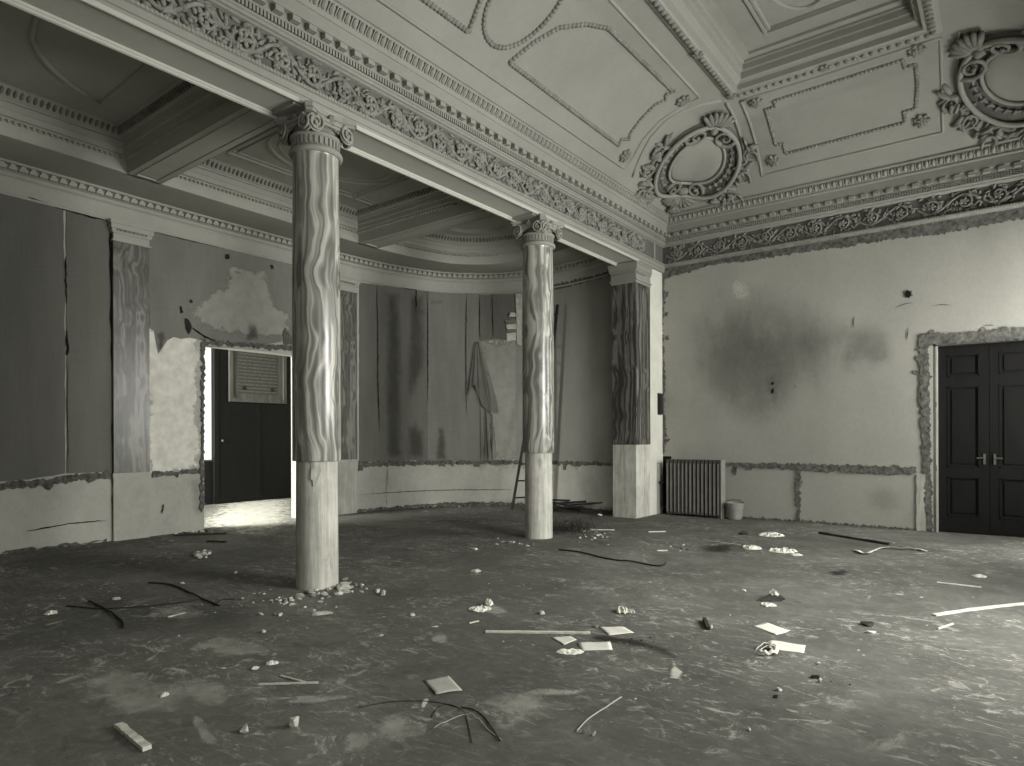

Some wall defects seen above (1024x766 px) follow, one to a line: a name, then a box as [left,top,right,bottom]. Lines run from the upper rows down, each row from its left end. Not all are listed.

spalling [0,470,112,491]
crack [63,331,71,454]
crack [29,197,112,362]
flaking render [149,267,292,513]
peeling [358,339,523,471]
spalling [552,460,613,470]
spalling [662,200,1024,454]
spalling [725,326,1024,532]